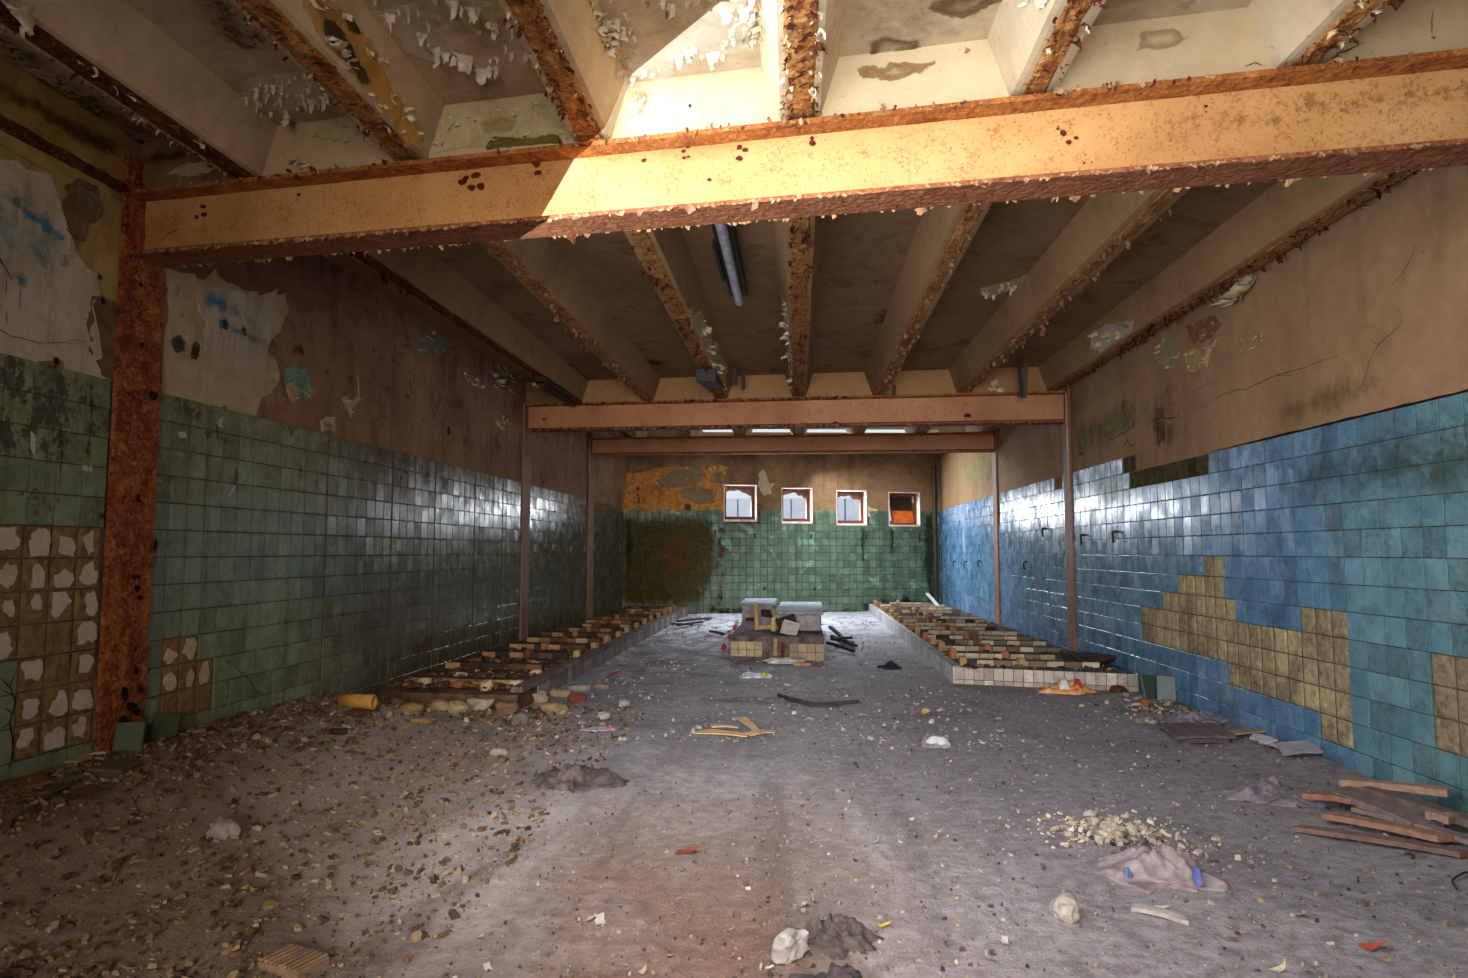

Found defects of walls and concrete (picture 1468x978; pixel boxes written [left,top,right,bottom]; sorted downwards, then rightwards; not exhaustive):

rust [0,19,345,194]
rust [236,0,455,170]
peeling [302,0,567,175]
rust [502,0,650,152]
peeling [590,0,765,113]
rust [767,0,967,125]
rust [1023,0,1107,96]
rust [1277,0,1405,75]
peeling [0,160,117,381]
peeling [161,268,316,427]
peeling [0,525,101,761]
peeling [1141,556,1354,749]